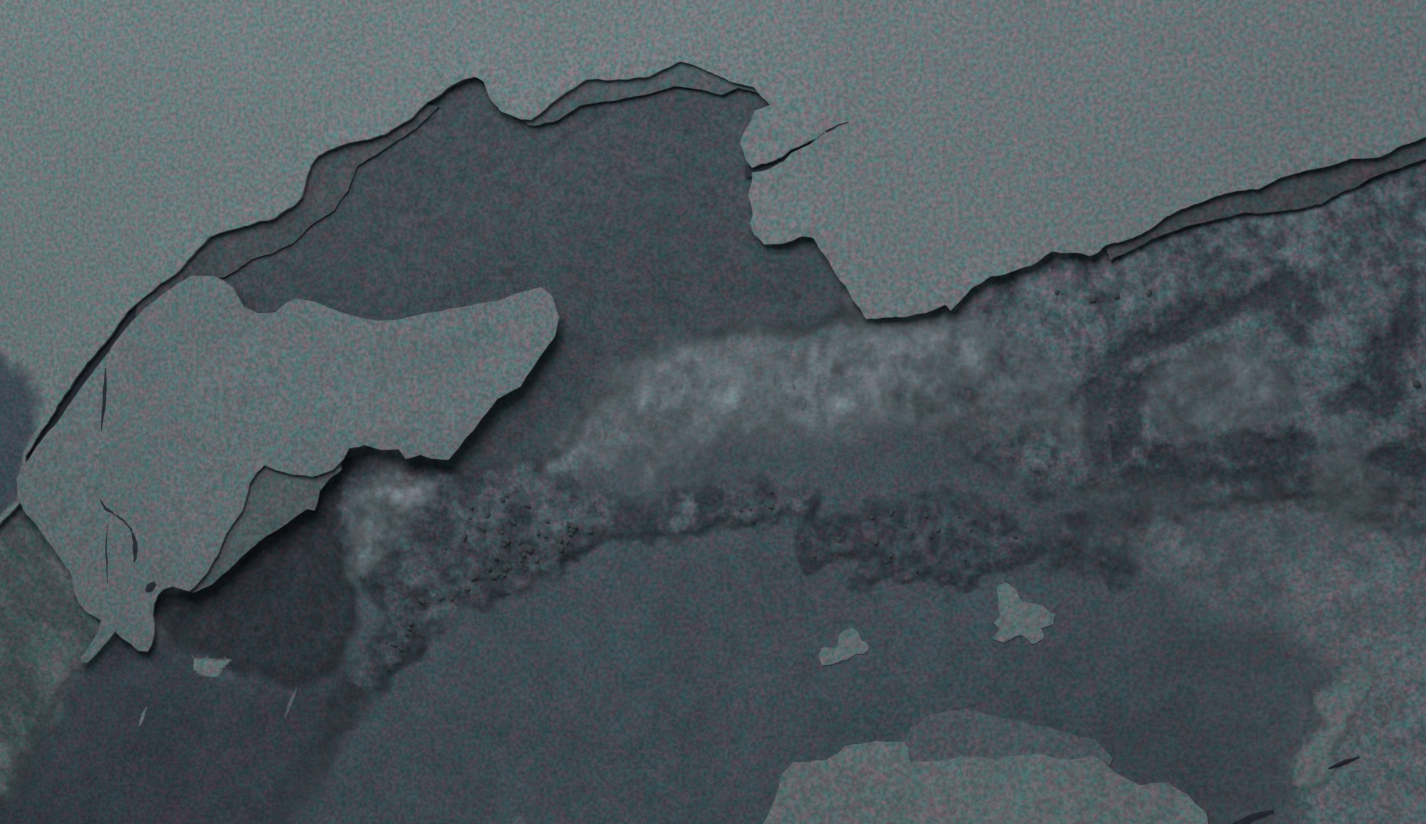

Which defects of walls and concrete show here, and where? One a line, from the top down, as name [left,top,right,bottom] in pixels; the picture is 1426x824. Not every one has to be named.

spalling [0,62,865,803]
crack [745,122,849,177]
spalling [842,137,1426,529]